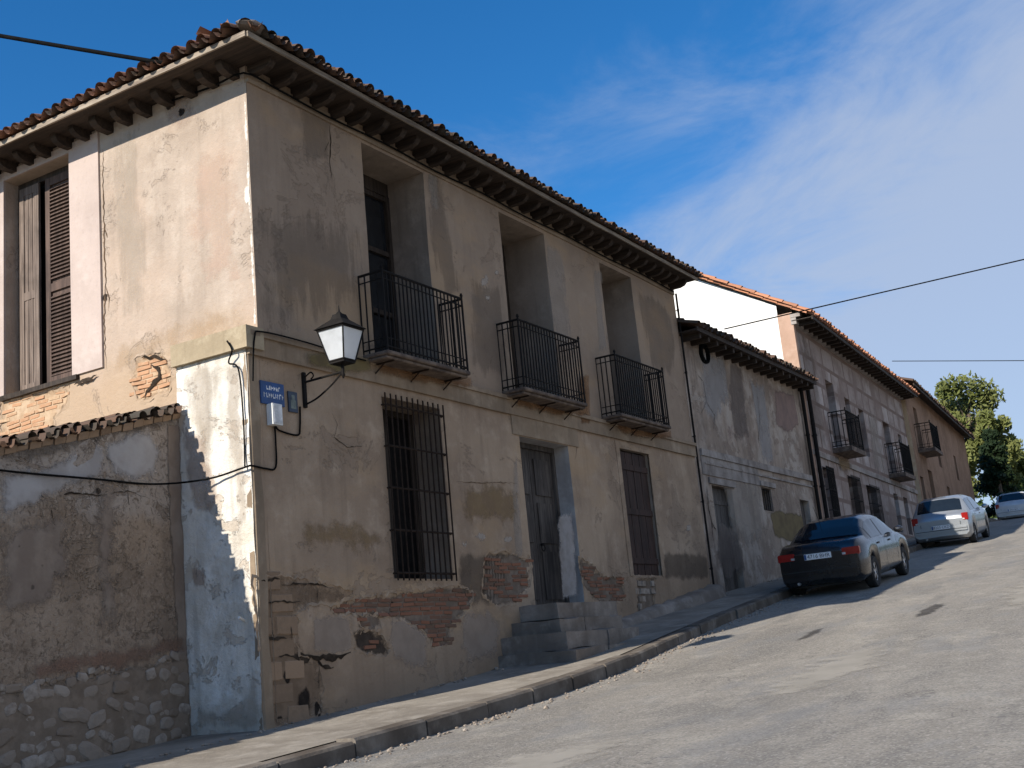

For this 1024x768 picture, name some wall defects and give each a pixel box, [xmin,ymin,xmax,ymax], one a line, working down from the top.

flaking render [129,349,175,405]
flaking render [0,375,96,436]
flaking render [578,555,657,610]
flaking render [250,533,534,728]
crack [279,652,351,669]